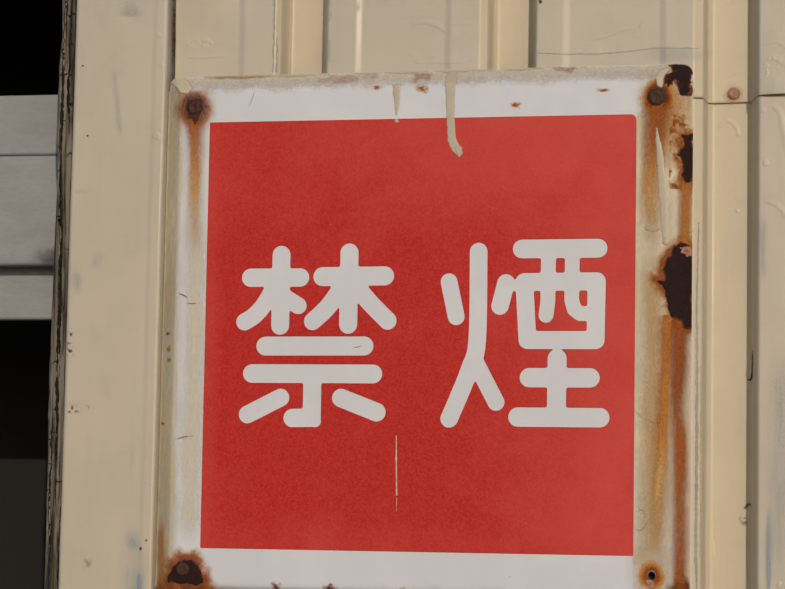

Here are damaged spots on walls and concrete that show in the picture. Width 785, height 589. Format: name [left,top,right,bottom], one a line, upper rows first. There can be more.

corrosion [178,91,211,223]
corrosion [642,78,692,221]
corrosion [184,236,202,523]
corrosion [158,531,215,589]
corrosion [639,560,664,589]